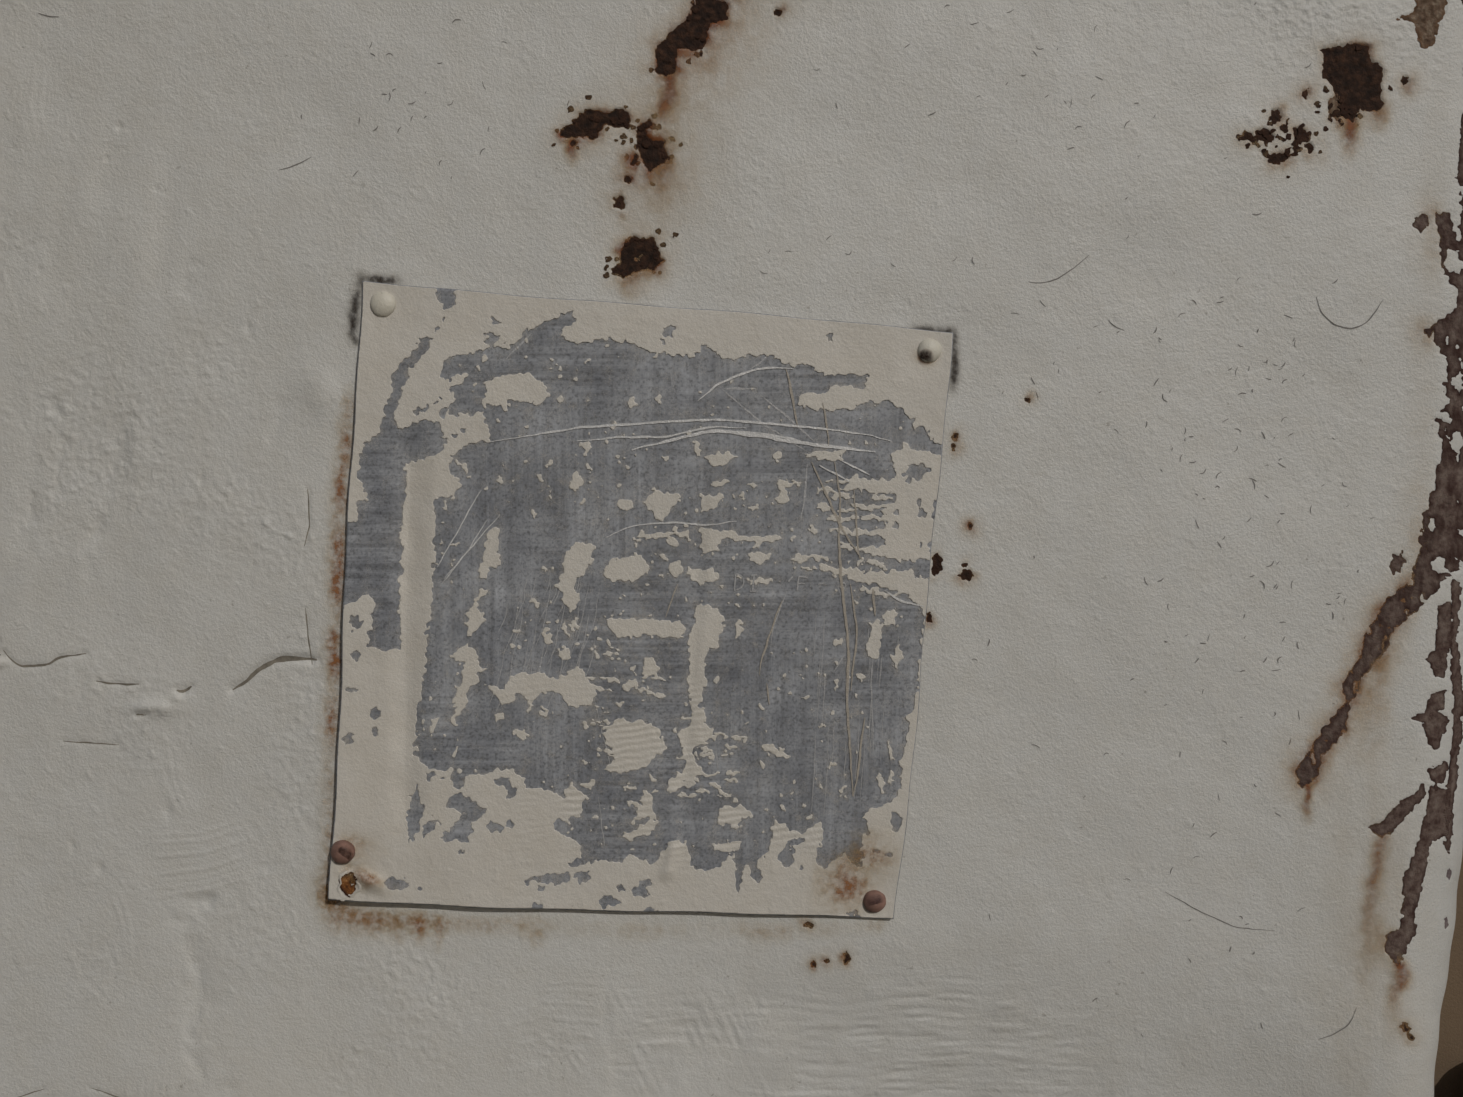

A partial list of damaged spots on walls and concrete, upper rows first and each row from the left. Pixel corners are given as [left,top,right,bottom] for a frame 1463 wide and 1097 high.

rust [551,0,732,210]
rust [1236,41,1409,178]
rust [603,228,679,279]
peeling [328,282,952,918]
rust [836,871,881,905]